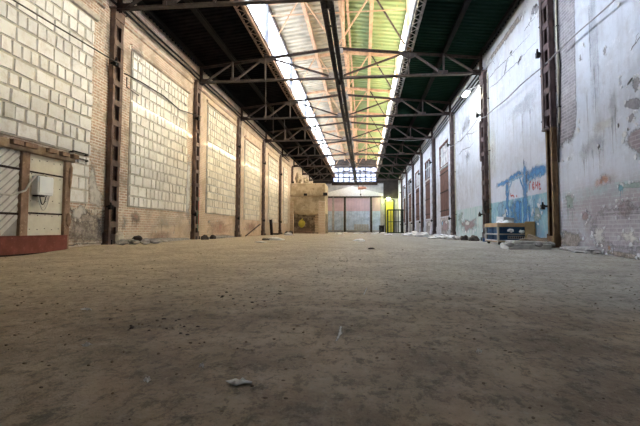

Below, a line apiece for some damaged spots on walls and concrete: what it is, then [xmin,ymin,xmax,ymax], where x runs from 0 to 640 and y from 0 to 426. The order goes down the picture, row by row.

spalling [616,74,640,164]
flaking render [69,160,105,247]
spalling [560,181,640,260]